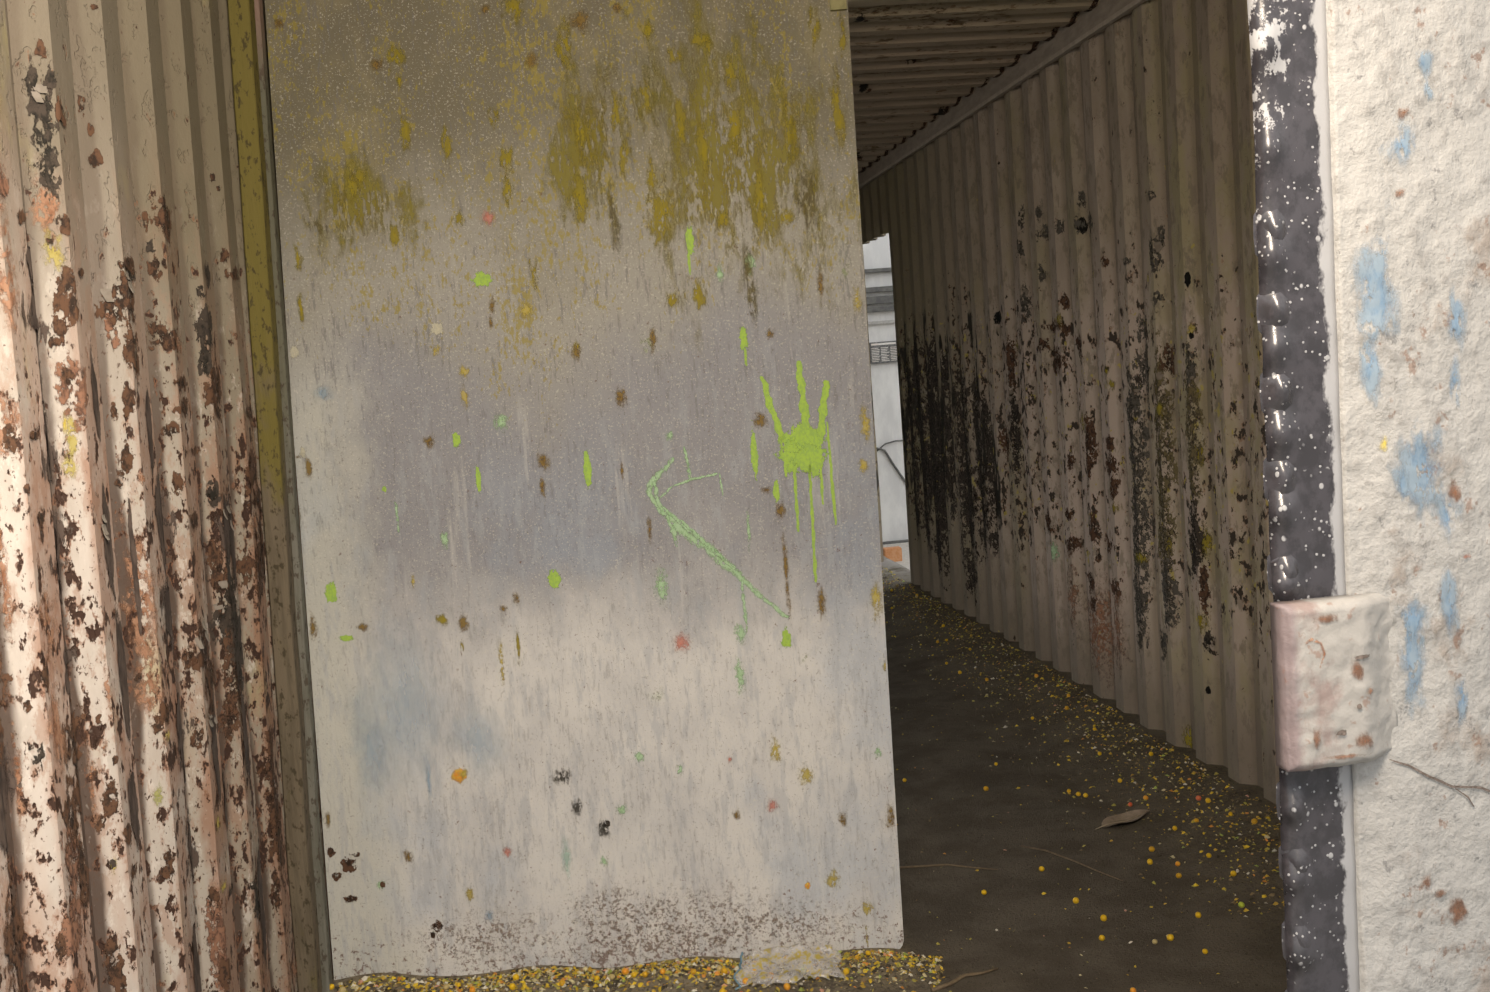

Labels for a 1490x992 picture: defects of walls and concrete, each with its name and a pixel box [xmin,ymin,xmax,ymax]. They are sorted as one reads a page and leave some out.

damp [611,89,631,174]
damp [691,34,741,156]
damp [390,224,399,246]
damp [610,196,620,241]
damp [646,158,678,246]
damp [744,94,816,315]
rust [0,163,182,433]
rust [114,440,145,489]
rust [182,617,216,750]
rust [0,530,37,992]
rust [46,656,132,992]
rust [201,886,232,992]